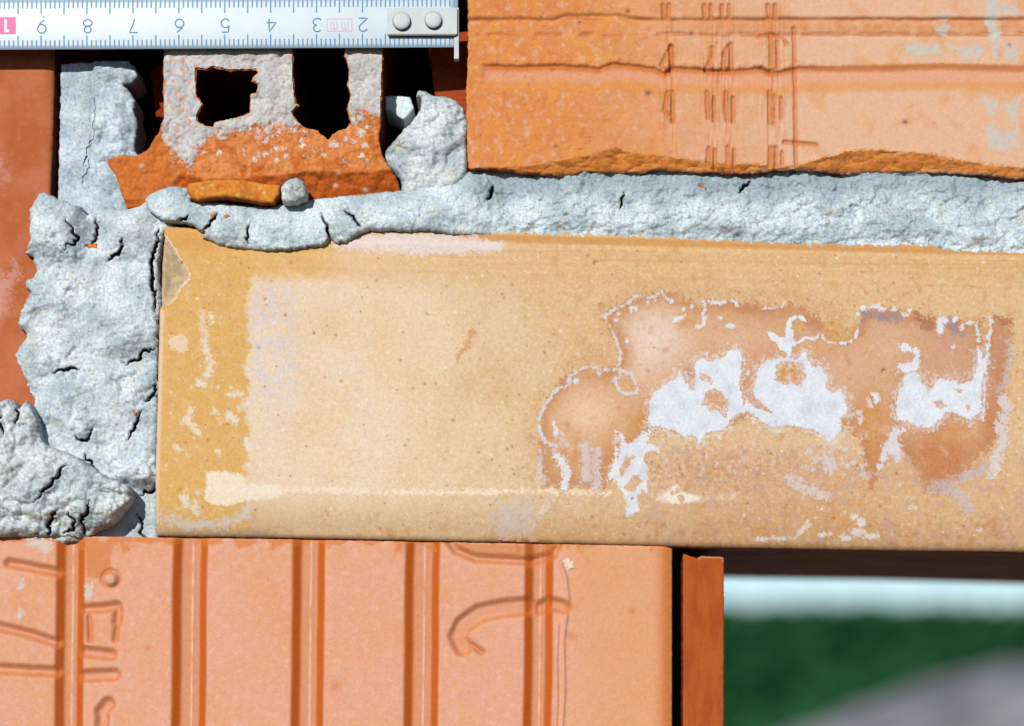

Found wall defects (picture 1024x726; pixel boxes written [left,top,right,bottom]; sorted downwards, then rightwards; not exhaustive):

crack [81,98,96,184]
crack [64,219,124,261]
crack [151,227,160,312]
crack [127,348,156,365]
crack [128,385,157,440]
damp [481,272,1019,542]
crack [34,429,94,535]